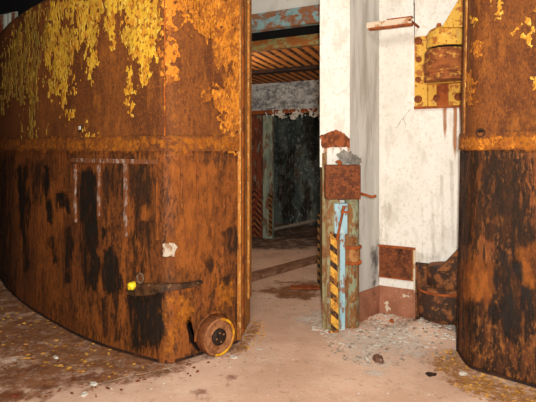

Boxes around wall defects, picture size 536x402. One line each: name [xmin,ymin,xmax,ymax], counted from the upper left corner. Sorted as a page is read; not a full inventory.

peeling [470,36,486,60]
peeling [490,0,504,21]
peeling [511,7,536,48]
peeling [1,0,168,139]
spalling [252,83,320,120]
rust [1,135,177,153]
rust [157,0,240,277]
rust [453,108,533,153]
rust [33,179,78,302]
rust [460,260,492,301]
rust [519,246,536,288]
rust [0,280,193,402]